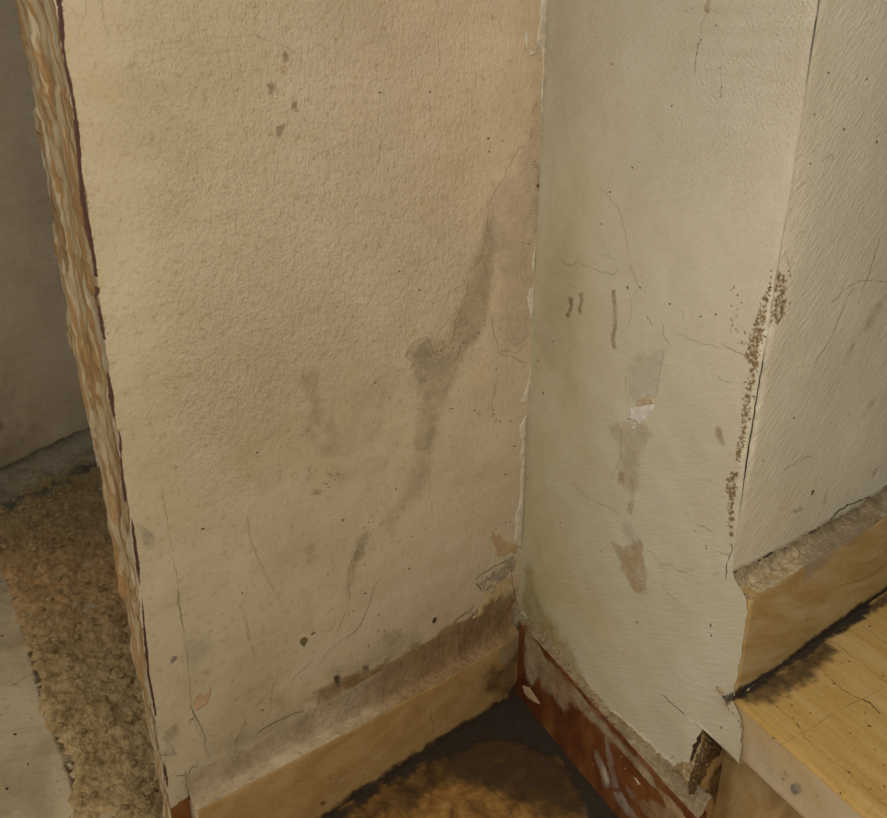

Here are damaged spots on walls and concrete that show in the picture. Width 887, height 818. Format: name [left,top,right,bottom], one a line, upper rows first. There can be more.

crack [832,250,882,330]
flaking render [627,395,654,429]
flaking render [453,370,531,624]
crack [236,665,309,742]
spalling [670,729,722,794]